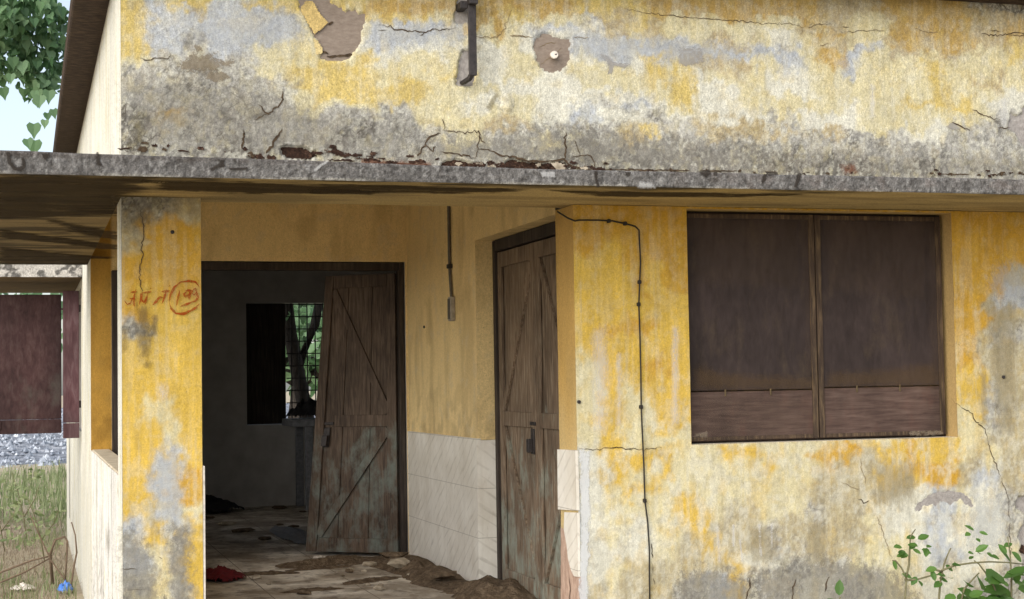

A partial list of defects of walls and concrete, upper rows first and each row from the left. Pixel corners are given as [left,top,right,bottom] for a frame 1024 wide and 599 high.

spalling [298,0,365,61]
spalling [533,33,571,73]
crack [241,92,284,159]
spalling [224,145,612,170]
crack [327,119,737,172]
crack [138,210,146,294]
crack [956,403,1012,553]